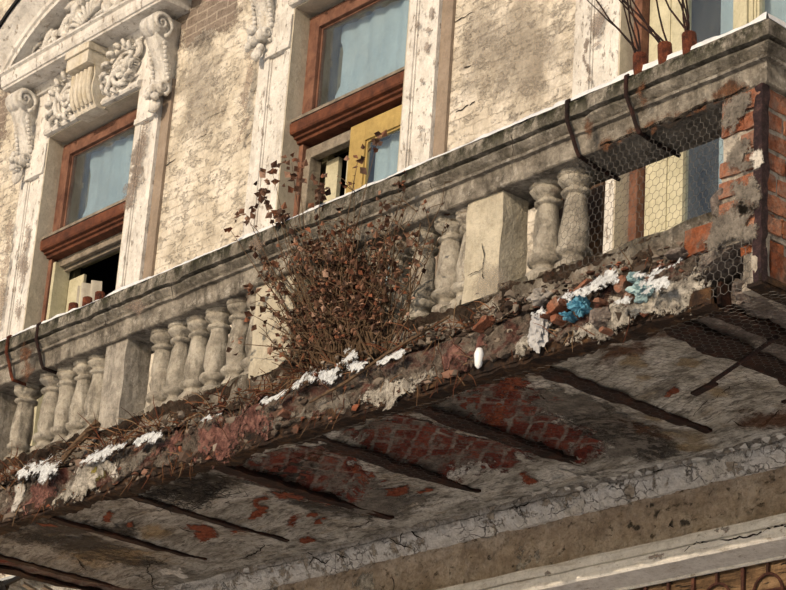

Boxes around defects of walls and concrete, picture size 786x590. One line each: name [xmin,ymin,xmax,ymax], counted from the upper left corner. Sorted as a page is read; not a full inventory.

spalling [335,331,786,516]
rust [735,402,786,431]
spalling [21,428,183,515]
spalling [192,393,434,531]
spalling [183,523,219,543]
crack [684,524,786,552]
crack [307,552,346,565]